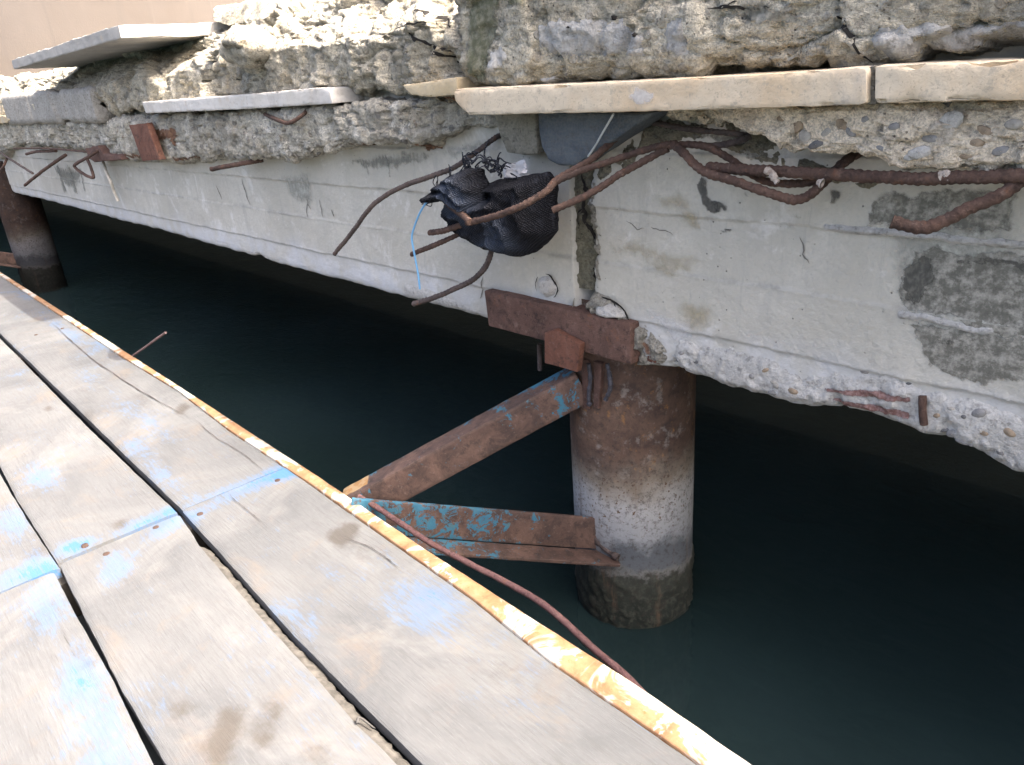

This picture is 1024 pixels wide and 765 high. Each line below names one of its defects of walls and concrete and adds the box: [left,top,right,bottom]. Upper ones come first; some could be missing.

peeling [487,46,507,73]
crack [836,16,873,63]
corrosion [155,128,201,161]
spalling [0,96,498,165]
spalling [588,100,1024,281]
crack [577,174,629,320]
damp [869,169,1024,386]
spalling [634,325,1024,472]
corrosion [825,388,910,419]